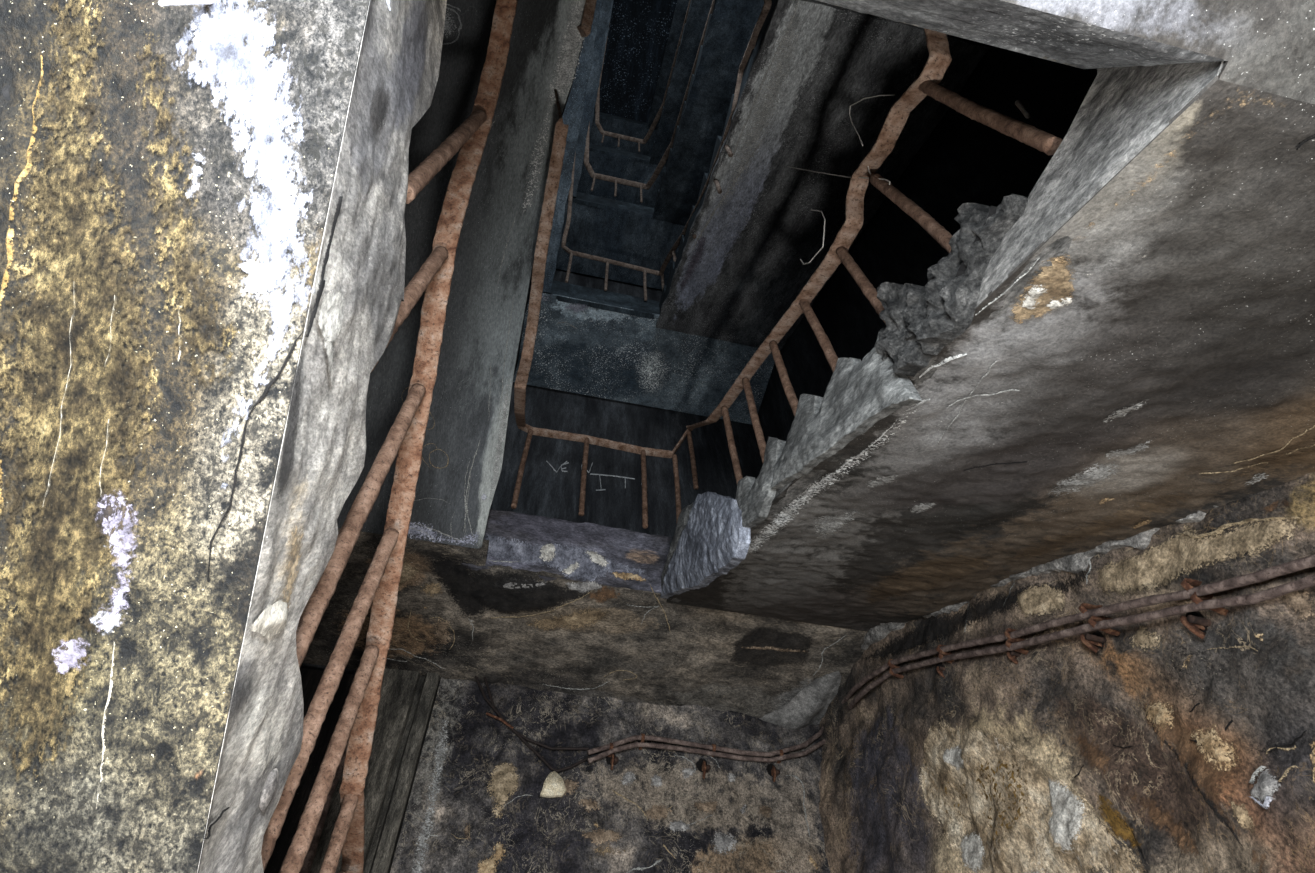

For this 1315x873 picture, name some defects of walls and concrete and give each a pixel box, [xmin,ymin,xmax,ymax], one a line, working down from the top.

damp [371,80,390,132]
flaking render [1011,255,1093,324]
damp [0,0,313,809]
crack [207,196,343,582]
flaking render [613,194,1028,599]
rust [281,525,304,608]
spalling [399,557,602,649]